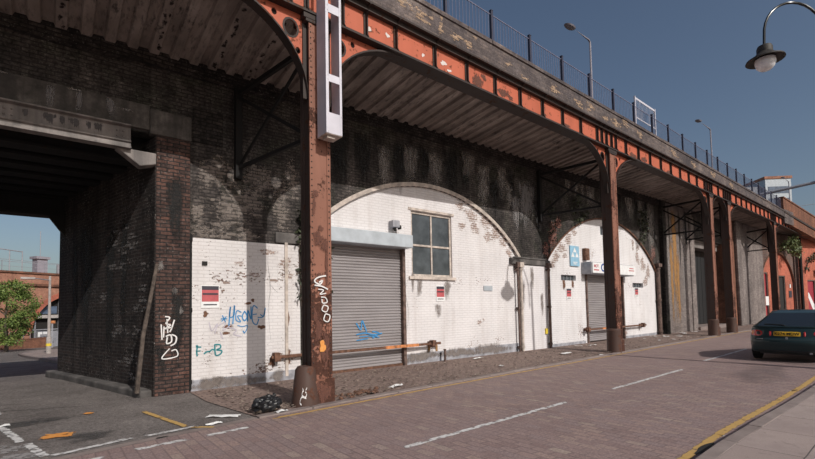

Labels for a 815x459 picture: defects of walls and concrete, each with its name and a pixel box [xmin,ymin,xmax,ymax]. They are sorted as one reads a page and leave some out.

spalling [398,0,477,49]
water stain [333,130,538,224]
water stain [168,180,183,234]
rust [313,225,328,285]
peeling [456,203,511,257]